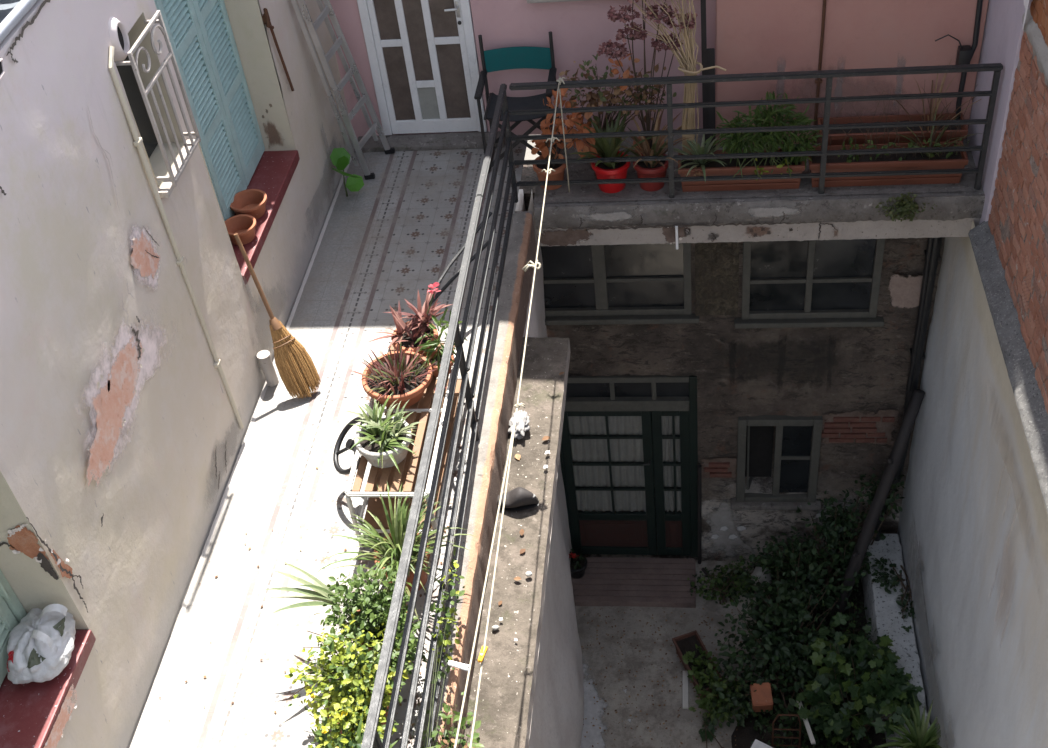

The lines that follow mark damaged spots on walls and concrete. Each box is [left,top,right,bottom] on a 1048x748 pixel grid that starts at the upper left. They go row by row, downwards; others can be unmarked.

crack [6,0,50,64]
flaking render [84,228,166,527]
flaking render [0,524,59,580]
crack [26,517,88,612]